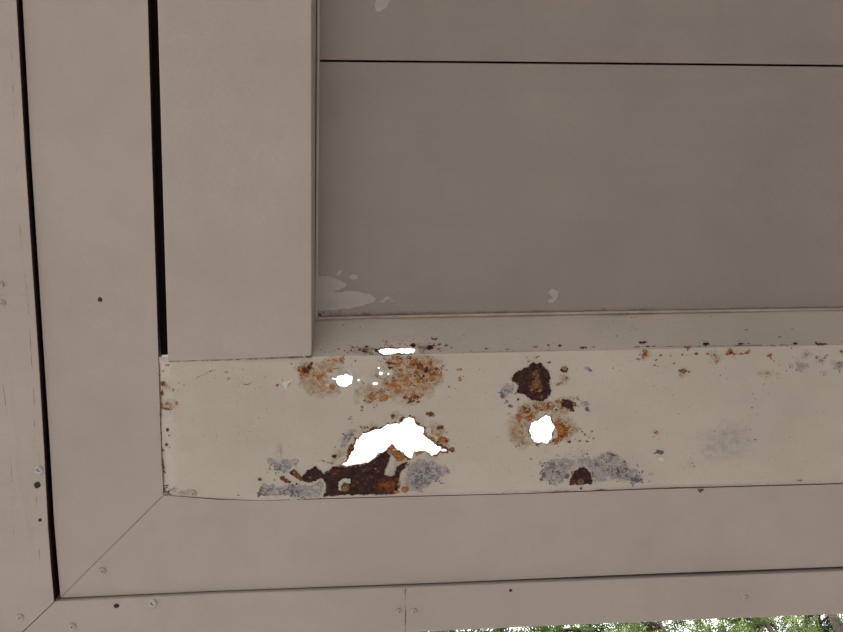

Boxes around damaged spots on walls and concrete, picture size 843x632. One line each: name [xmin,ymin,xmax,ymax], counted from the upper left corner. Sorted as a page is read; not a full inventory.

peeling [318,268,396,311]
corrosion [291,337,464,411]
corrosion [509,346,594,447]
corrosion [418,423,455,453]
corrosion [274,437,422,497]
peeling [401,459,449,493]
corrosion [556,467,594,492]
peeling [530,450,652,486]